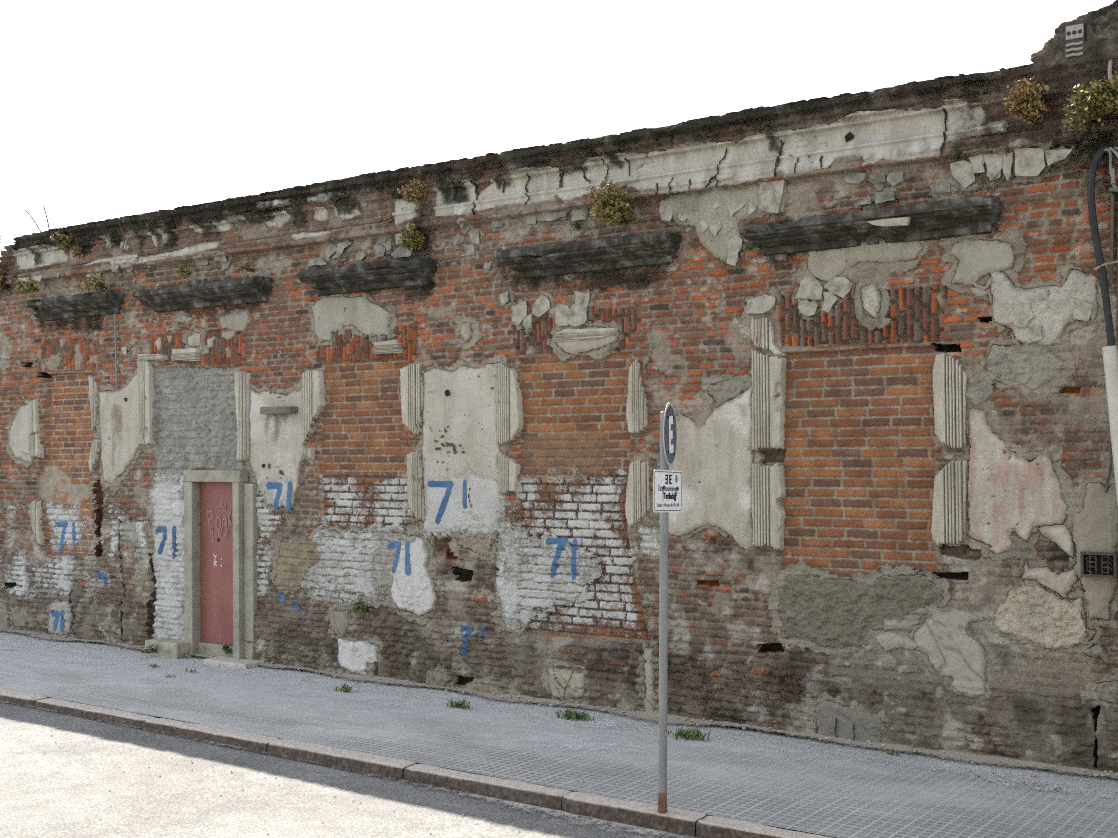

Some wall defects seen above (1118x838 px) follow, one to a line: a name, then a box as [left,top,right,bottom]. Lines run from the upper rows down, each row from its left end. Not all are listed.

peeling [2,99,1110,663]